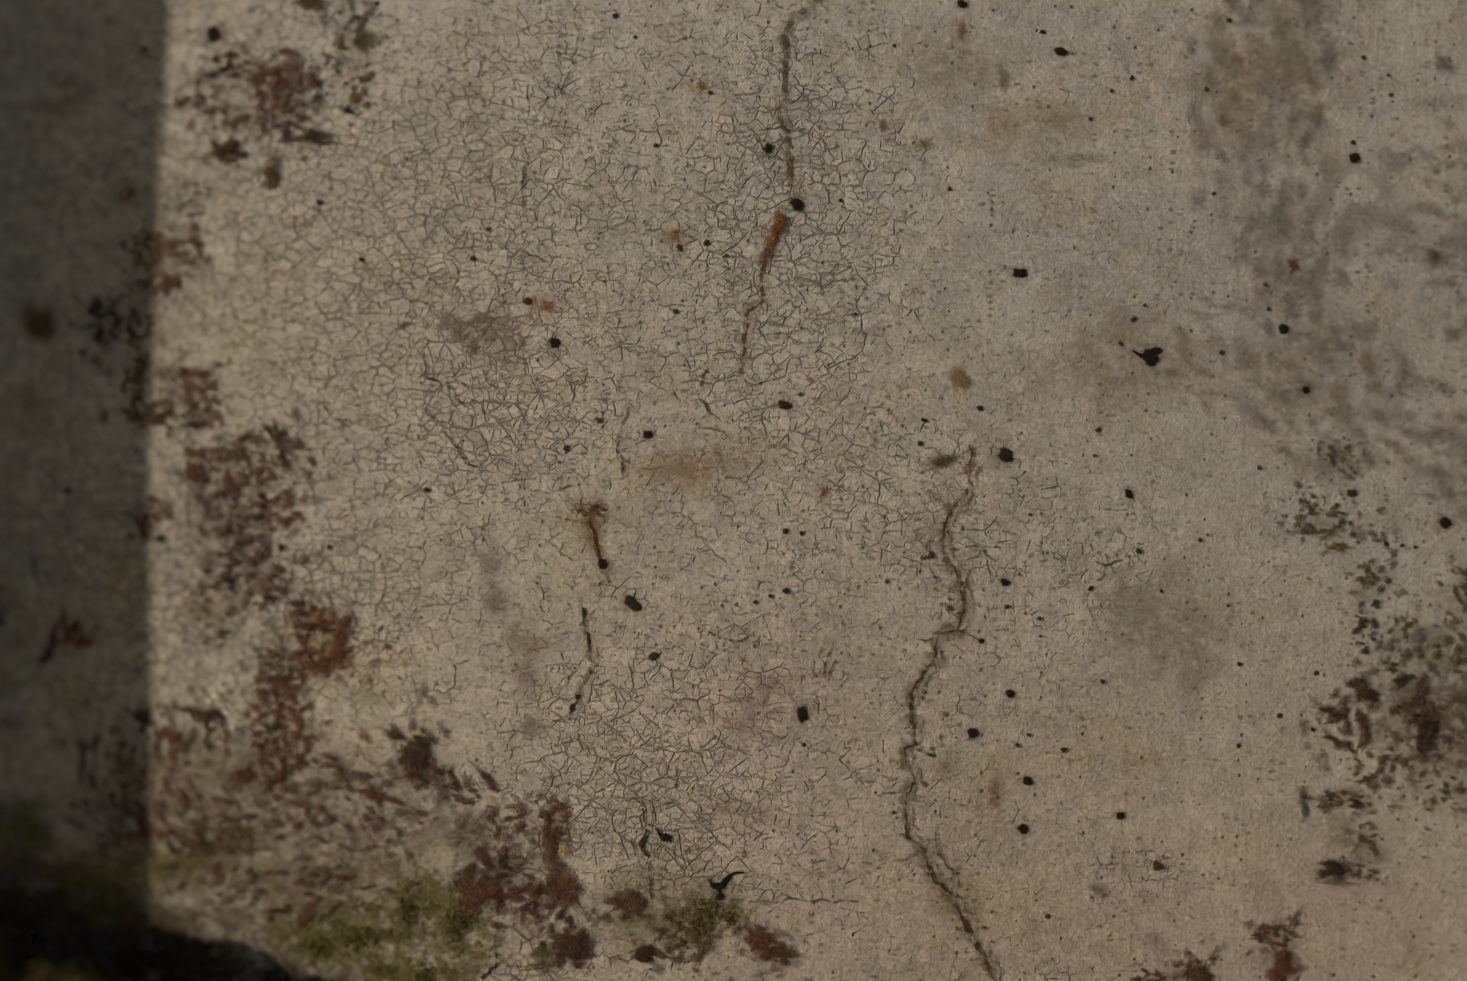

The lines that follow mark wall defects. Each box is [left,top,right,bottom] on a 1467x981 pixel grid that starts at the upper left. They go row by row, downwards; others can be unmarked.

crack [561,26,579,149]
crack [776,0,816,201]
crack [502,166,545,305]
corrosion [762,210,785,272]
crack [699,244,772,417]
crack [423,355,526,468]
crack [616,407,629,474]
crack [558,485,610,720]
crack [823,649,835,681]
crack [899,445,1020,981]
crack [631,798,671,899]
crack [776,884,858,904]